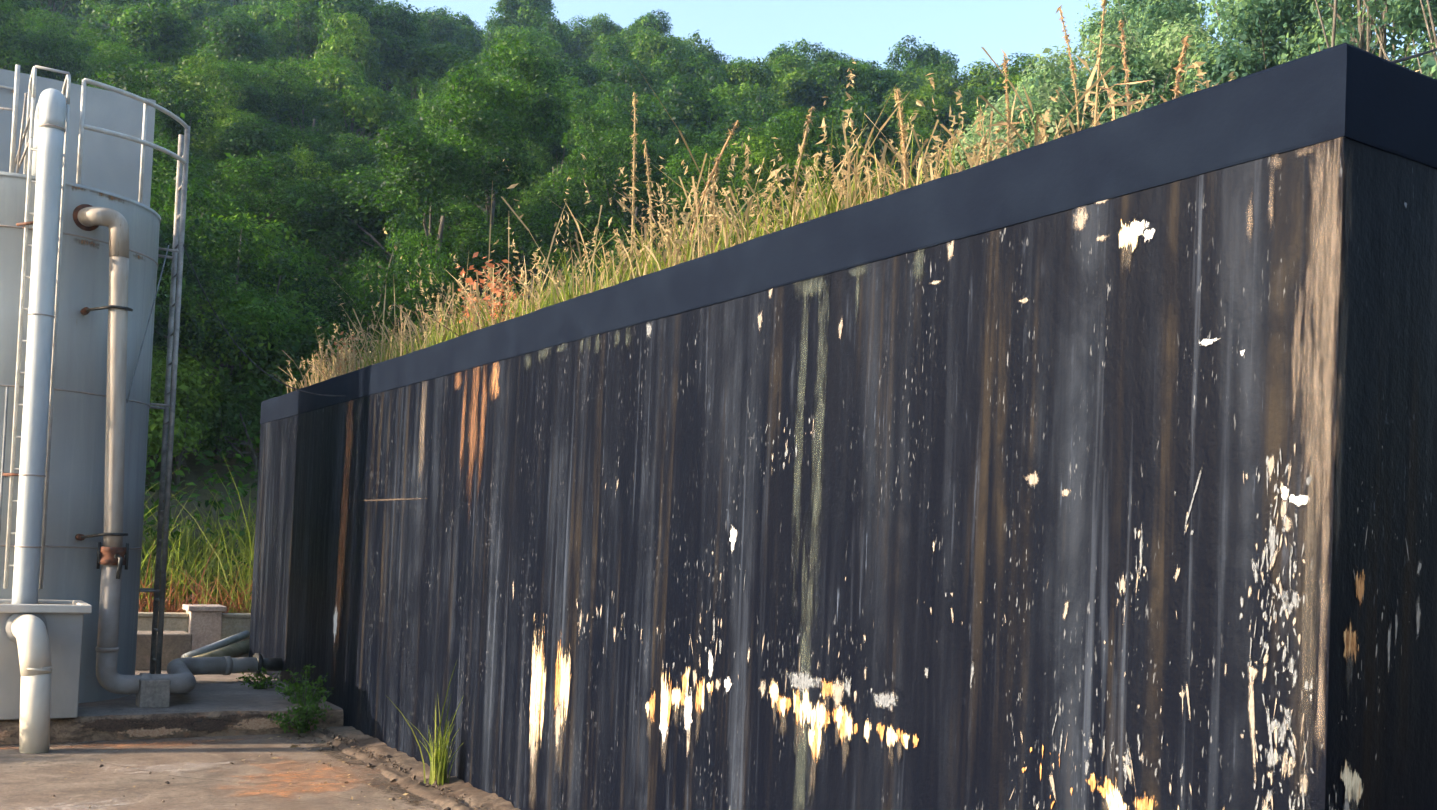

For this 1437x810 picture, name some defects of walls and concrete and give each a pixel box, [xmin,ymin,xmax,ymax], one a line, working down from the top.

peeling [1075,199,1108,229]
peeling [1097,220,1155,264]
damp [1269,157,1280,219]
rust [455,365,499,481]
damp [1293,145,1338,698]
rust [333,404,353,666]
peeling [1115,523,1148,624]
peeling [1184,472,1201,535]
peeling [1225,372,1402,810]
peeling [527,593,675,800]
peeling [645,611,919,787]
peeling [1021,716,1192,810]